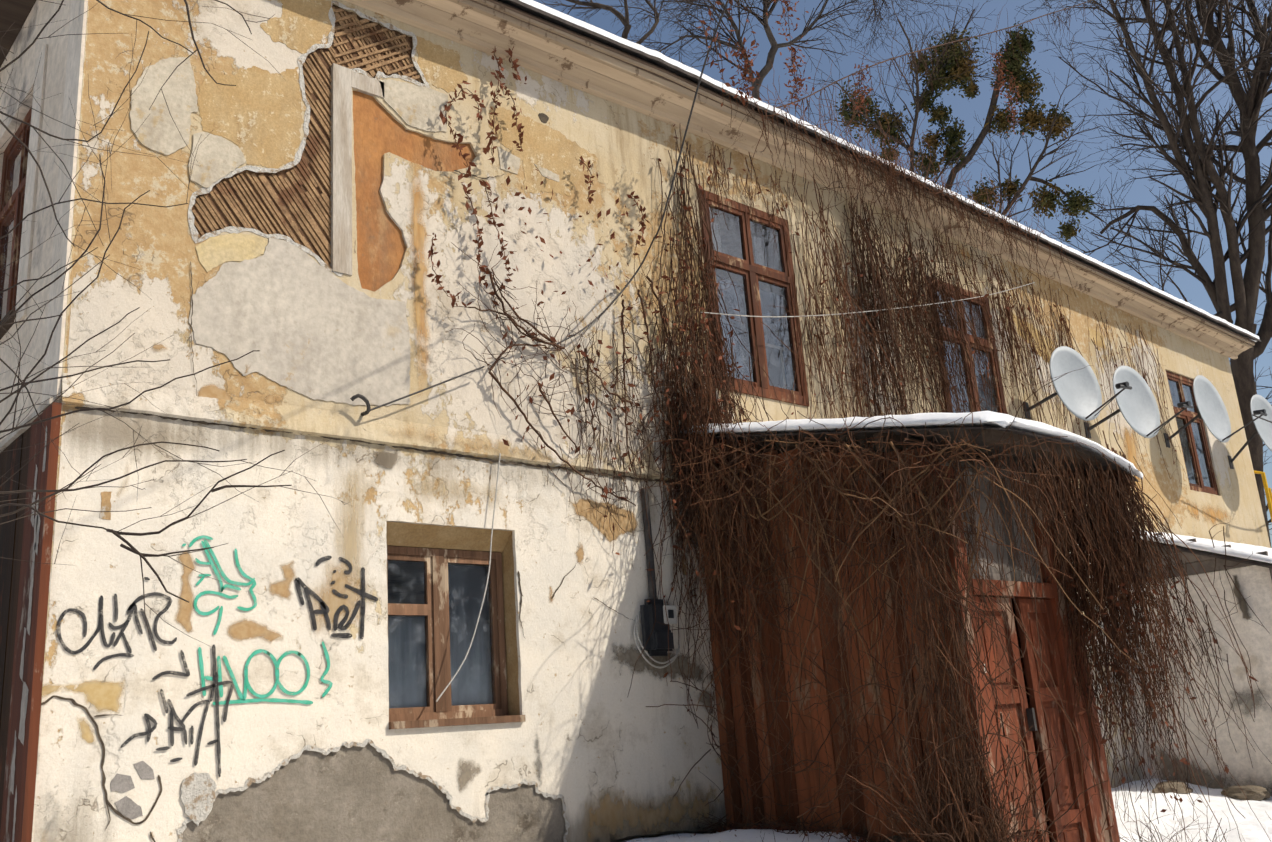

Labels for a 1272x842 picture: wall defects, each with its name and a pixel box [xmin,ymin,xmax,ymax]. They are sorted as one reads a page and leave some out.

flaking render [188,0,476,292]
peeling [198,385,231,400]
peeling [572,499,637,542]
peeling [270,563,294,598]
peeling [10,426,122,842]
peeling [228,620,281,642]
flaking render [110,761,155,819]
flaking render [177,739,570,842]
leakage [588,793,720,842]